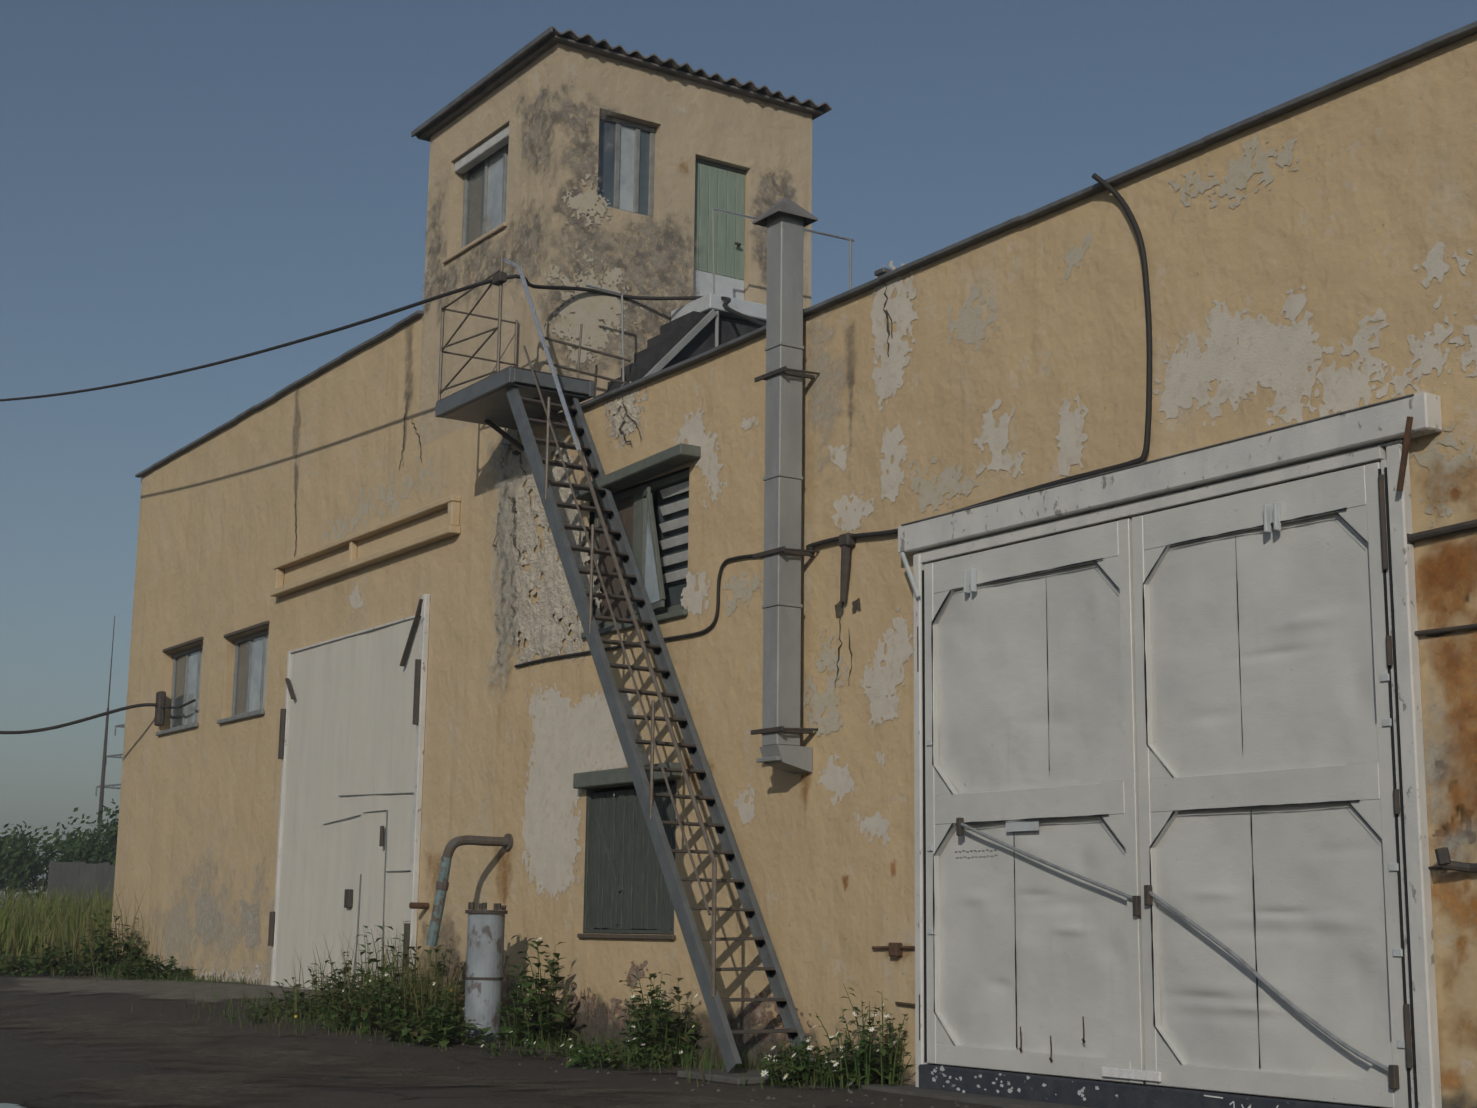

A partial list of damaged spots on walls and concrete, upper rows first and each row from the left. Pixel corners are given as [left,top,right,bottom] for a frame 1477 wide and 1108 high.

leakage [423,85,698,375]
crack [883,283,892,357]
peeling [1153,241,1477,428]
crack [399,394,422,468]
peeling [674,408,727,509]
peeling [1055,389,1089,476]
crack [291,484,299,557]
corrosion [1416,547,1477,626]
peeling [496,426,650,907]
crack [834,617,852,688]
peeling [803,598,914,806]
corrosion [1432,881,1477,955]